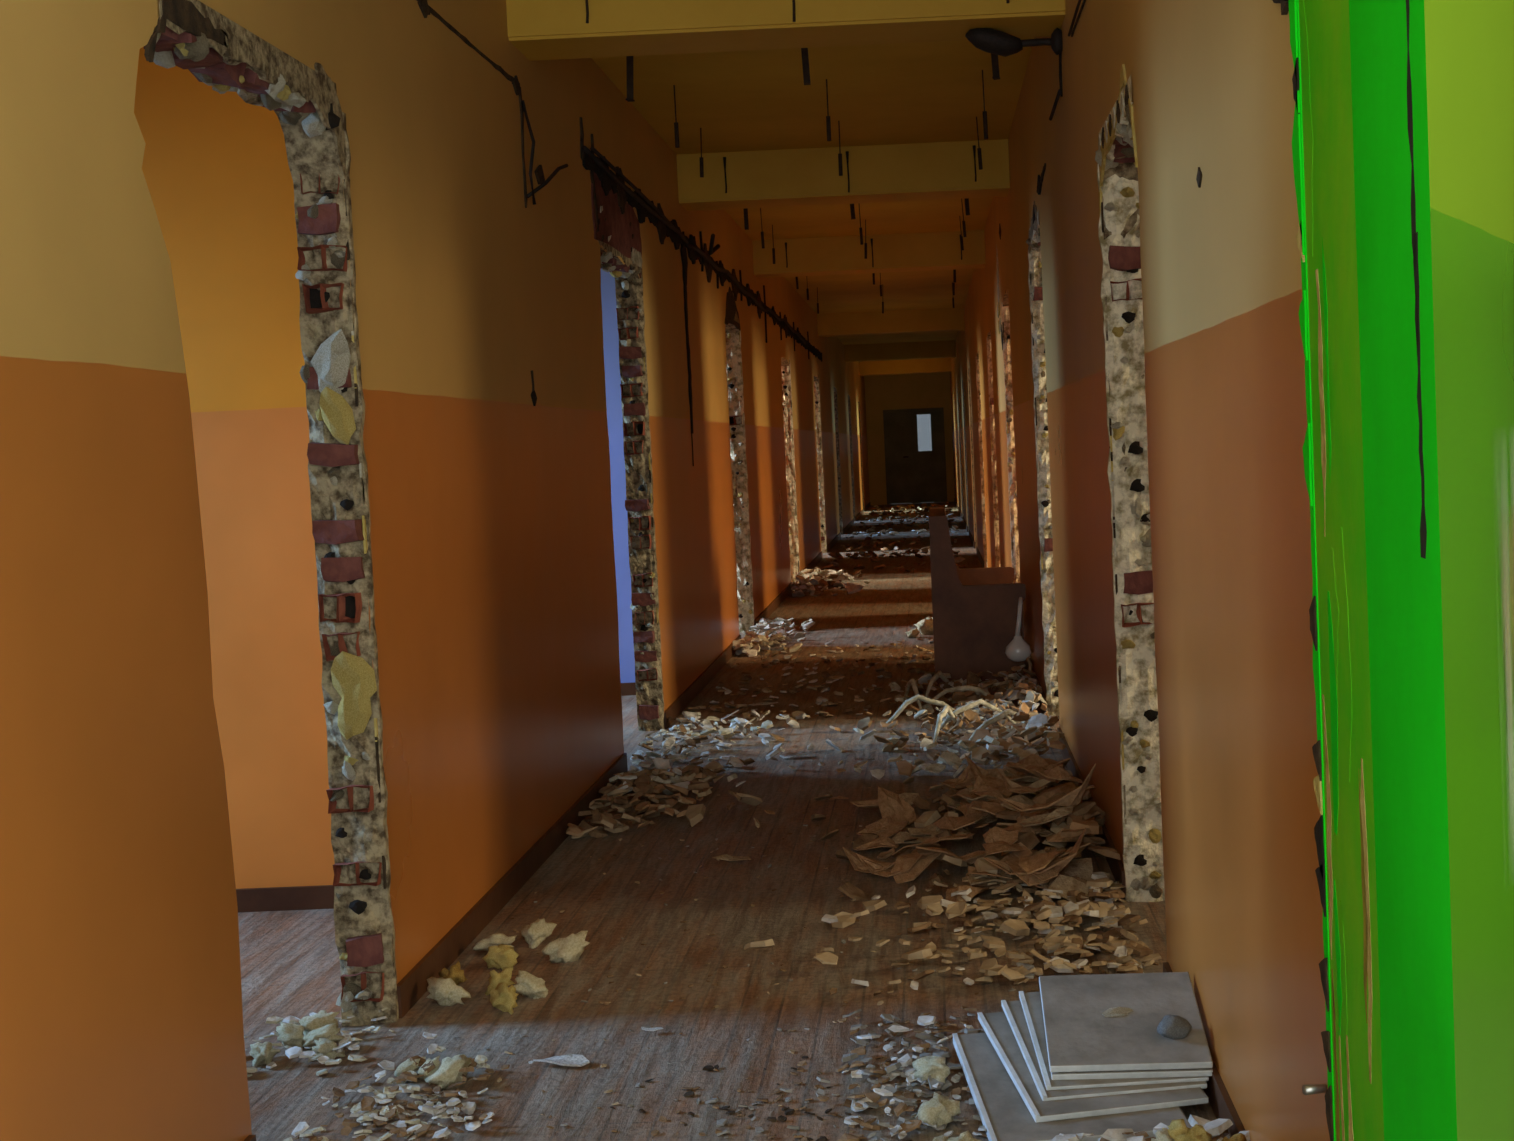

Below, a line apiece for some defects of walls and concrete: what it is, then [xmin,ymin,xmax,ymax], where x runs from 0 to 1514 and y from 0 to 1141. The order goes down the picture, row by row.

spalling [144,0,399,1026]
spalling [591,172,665,731]
spalling [1095,64,1165,902]